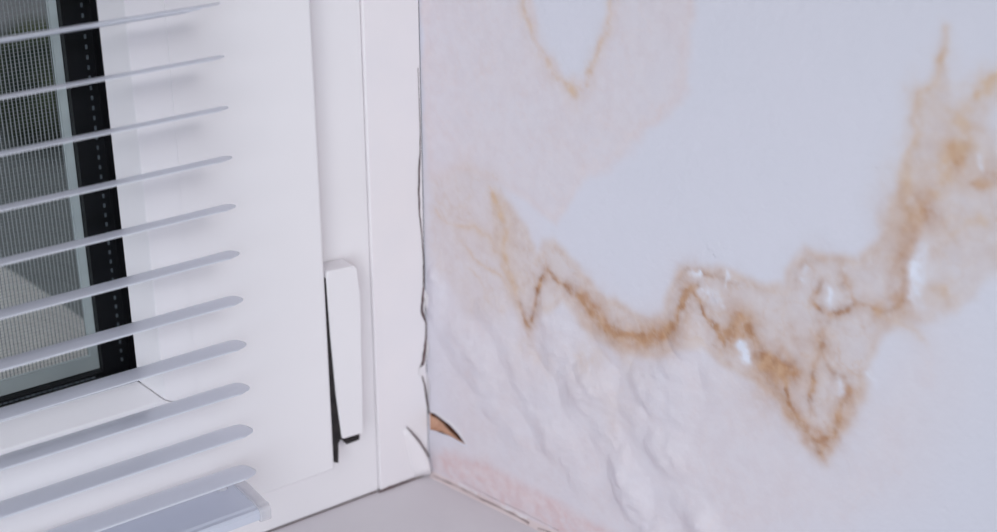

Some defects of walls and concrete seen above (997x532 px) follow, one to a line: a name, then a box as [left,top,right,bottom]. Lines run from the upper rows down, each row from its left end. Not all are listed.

spalling [430,411,467,445]
damp [420,0,997,532]